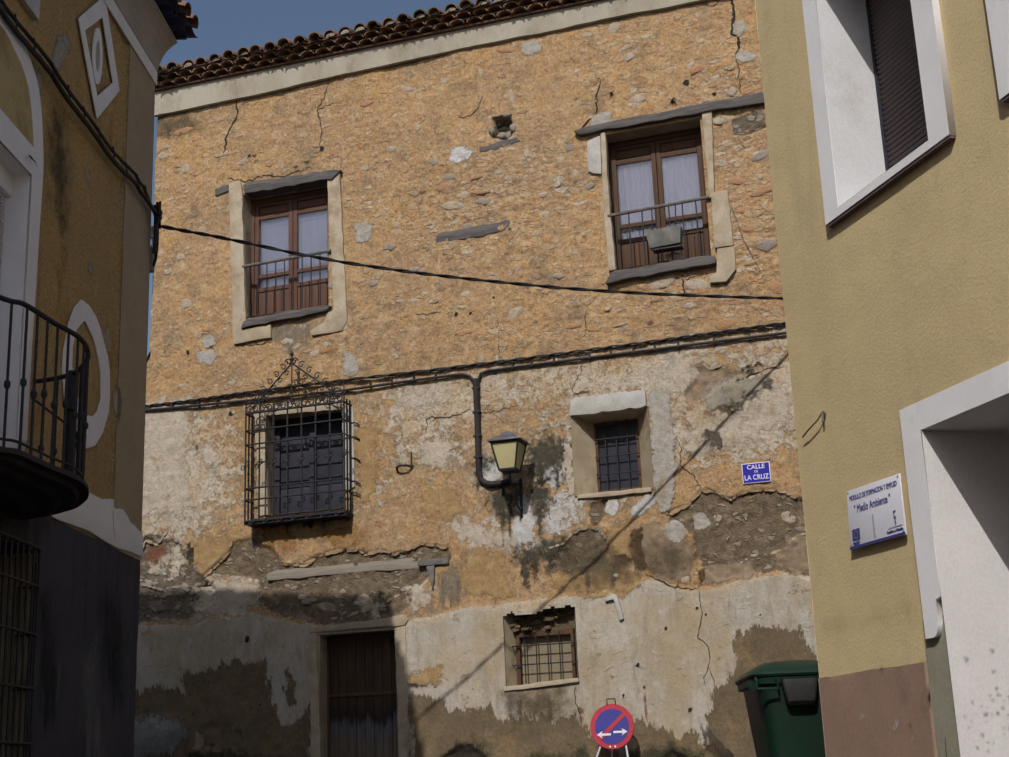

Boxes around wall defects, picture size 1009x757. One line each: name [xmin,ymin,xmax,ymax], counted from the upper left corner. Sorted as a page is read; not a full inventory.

flaking render [608,21,652,62]
crack [730,0,741,91]
crack [223,101,239,153]
crack [317,83,336,147]
crack [230,169,306,182]
flaking render [647,275,710,290]
peeling [391,380,459,421]
spalling [139,392,809,625]
leakage [472,424,630,589]
crack [647,575,715,689]
peeling [407,663,619,757]
peeling [632,623,816,757]